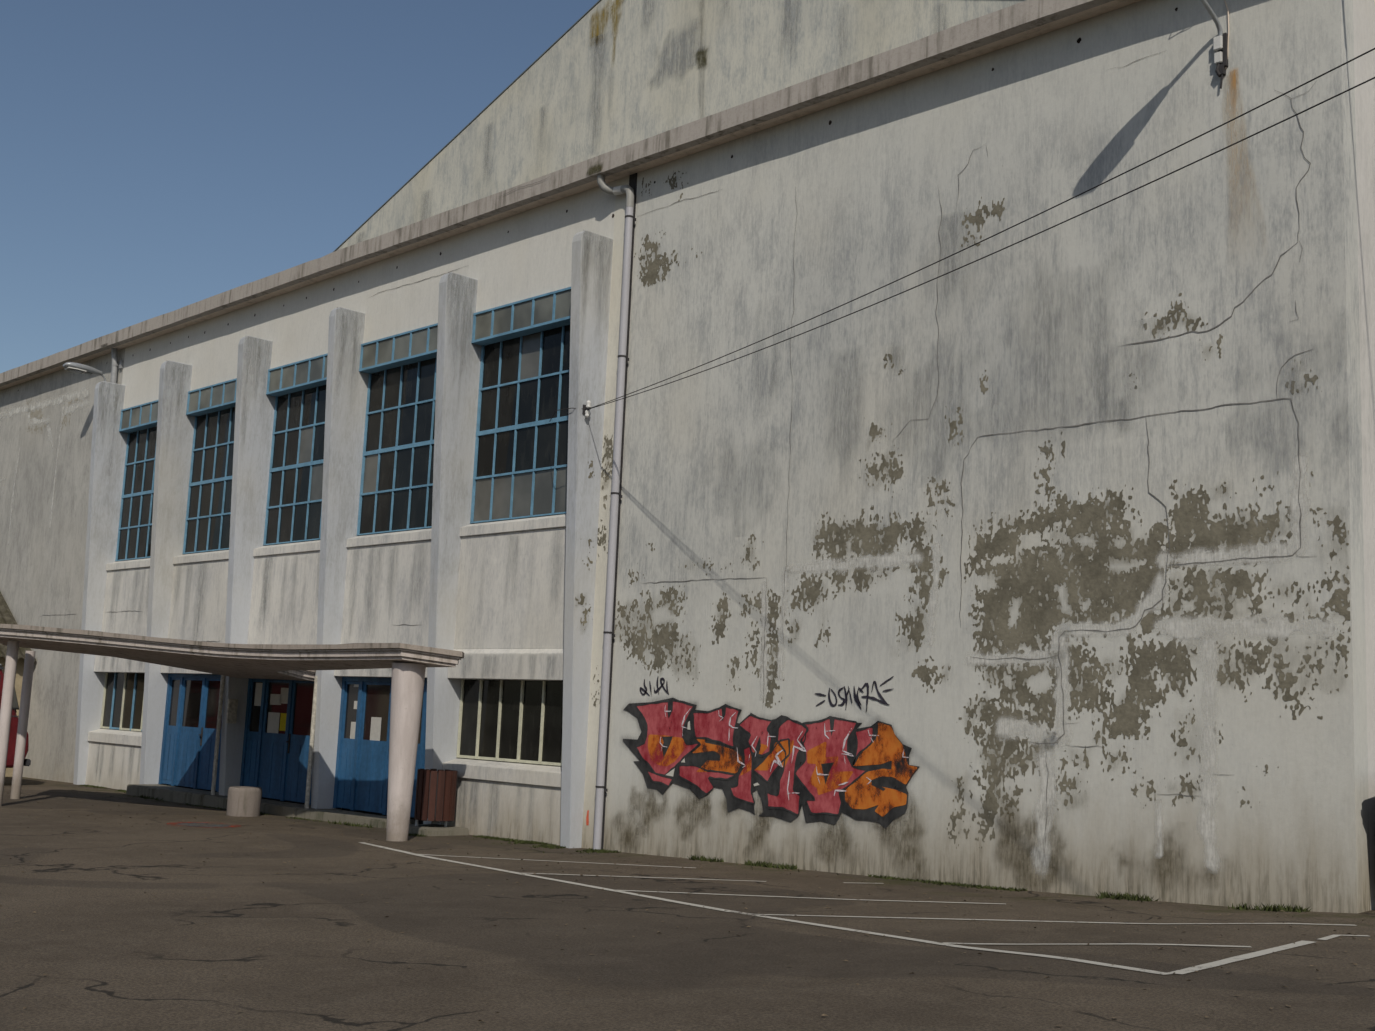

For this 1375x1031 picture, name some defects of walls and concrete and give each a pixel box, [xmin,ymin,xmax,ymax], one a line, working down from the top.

water stain [592,0,621,53]
water stain [658,32,707,80]
peeling [961,196,1005,247]
crack [1122,82,1316,346]
peeling [634,232,702,287]
peeling [1142,293,1223,361]
crack [959,300,1313,865]
peeling [614,418,1351,849]
water stain [1001,814,1060,881]